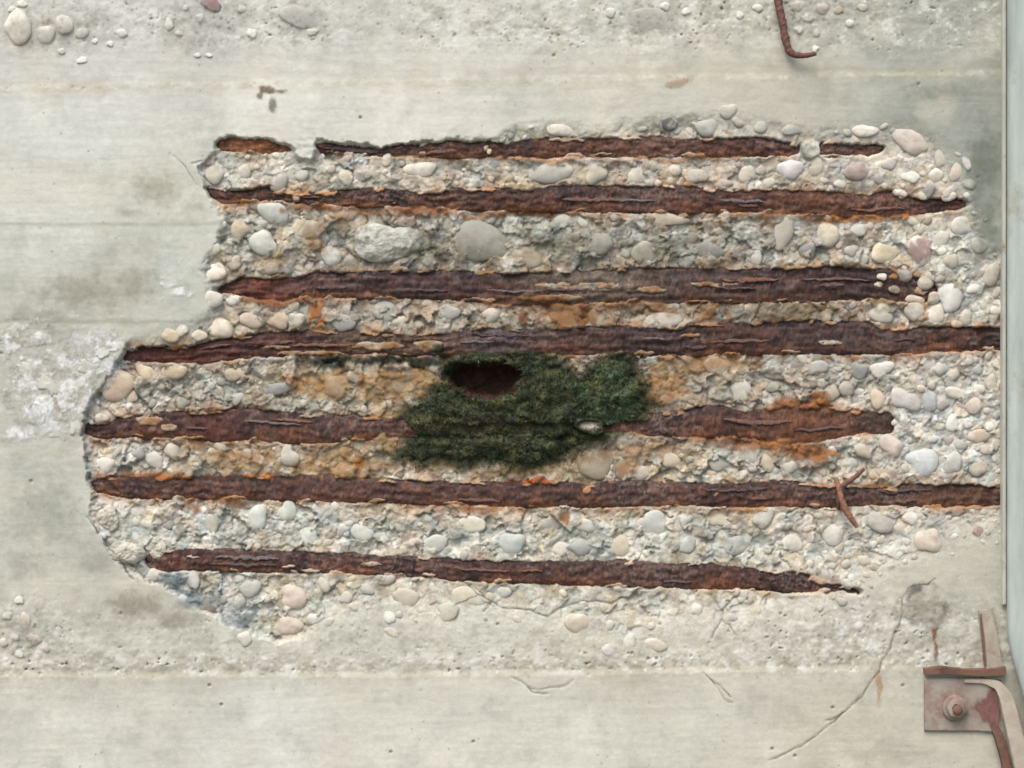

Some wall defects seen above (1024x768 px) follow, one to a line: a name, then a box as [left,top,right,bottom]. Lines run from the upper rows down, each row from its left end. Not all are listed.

rust [494,156,581,165]
rust [366,206,551,219]
rust [808,214,909,222]
spalling [0,104,1007,658]
rust [766,391,829,412]
damp [6,398,60,439]
rust [683,435,839,461]